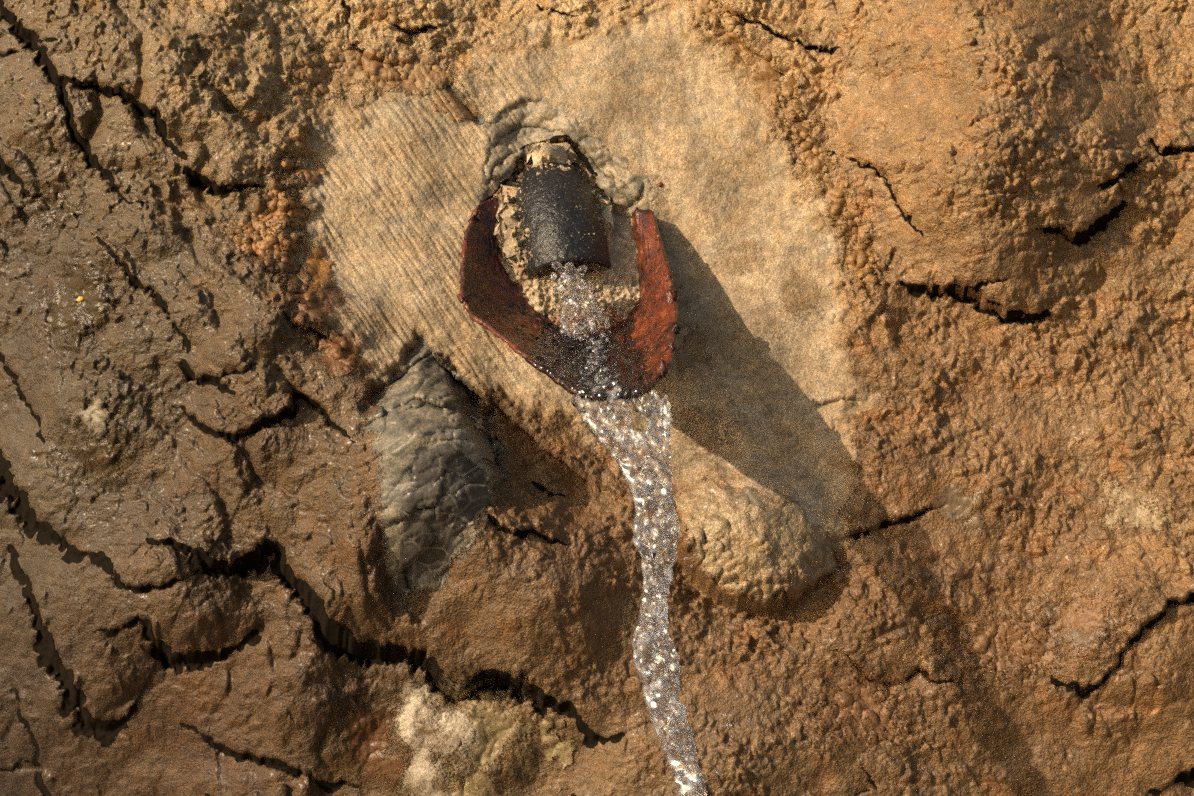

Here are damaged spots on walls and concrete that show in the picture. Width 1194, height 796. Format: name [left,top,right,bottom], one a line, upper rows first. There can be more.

crack [386,19,439,35]
crack [0,0,260,206]
crack [519,134,597,176]
crack [828,151,924,236]
crack [1036,138,1194,247]
crack [91,233,355,444]
crack [900,278,1050,325]
crack [0,449,625,748]
crack [1050,593,1194,699]
crack [179,723,359,794]
leakage [326,657,580,796]
crack [1148,768,1194,796]